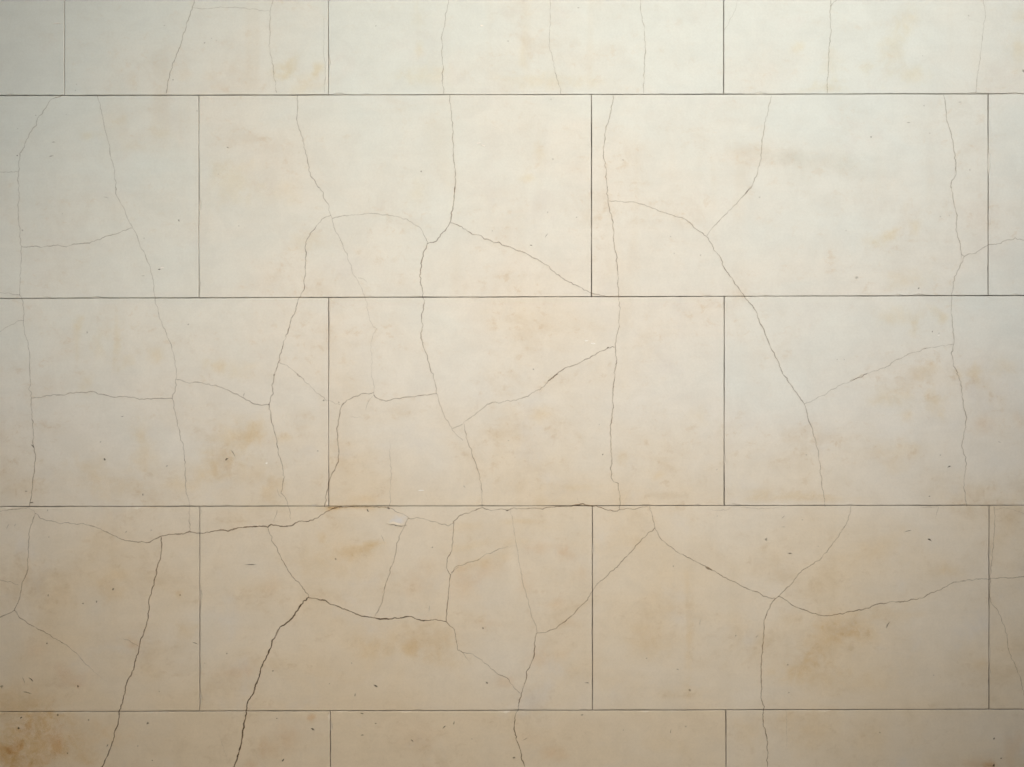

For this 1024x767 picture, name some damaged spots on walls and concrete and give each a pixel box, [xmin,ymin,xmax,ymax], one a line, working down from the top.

crack [102,489,342,767]
crack [234,597,449,767]